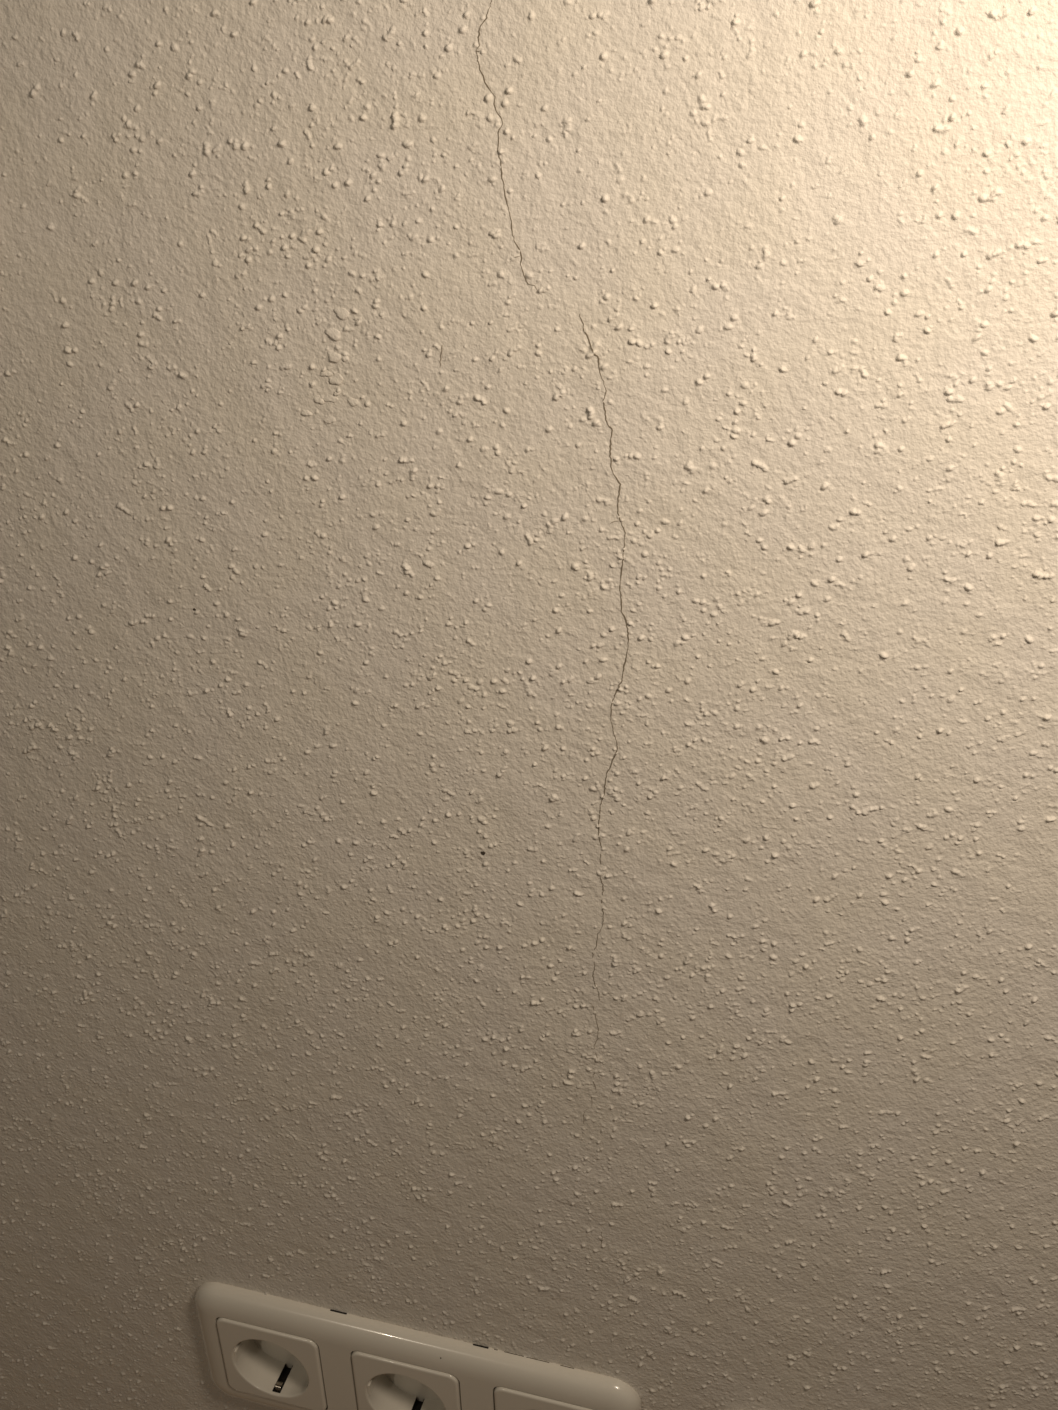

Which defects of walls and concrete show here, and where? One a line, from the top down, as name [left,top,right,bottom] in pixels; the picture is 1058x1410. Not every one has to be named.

crack [476,1,537,293]
crack [579,314,629,1123]